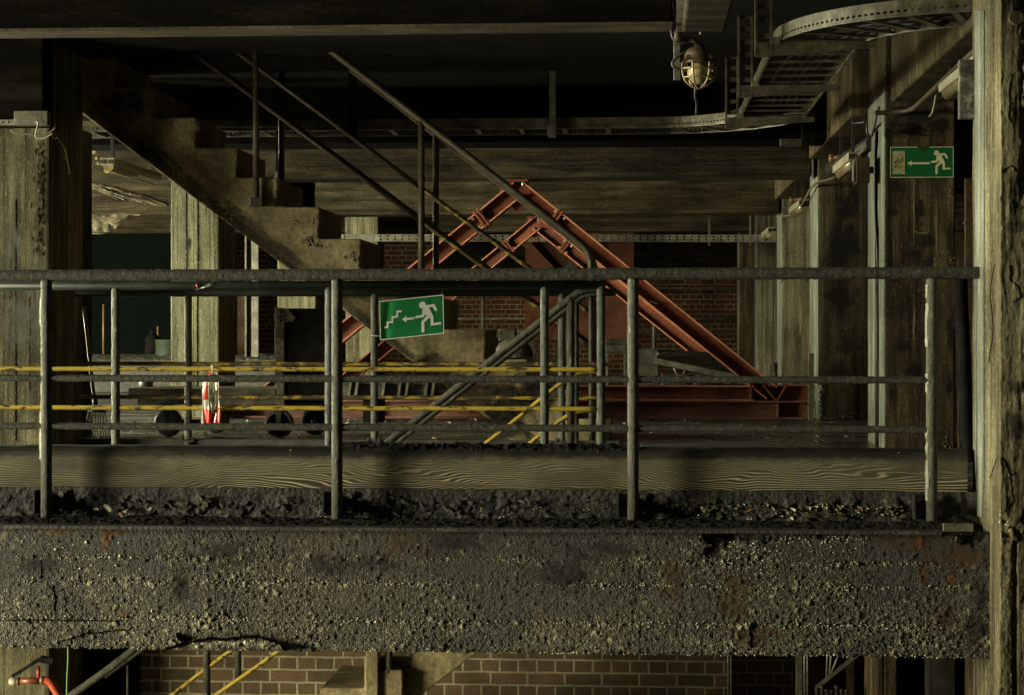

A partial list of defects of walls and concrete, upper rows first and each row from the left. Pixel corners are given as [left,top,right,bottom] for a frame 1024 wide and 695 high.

crack [165,632,306,651]